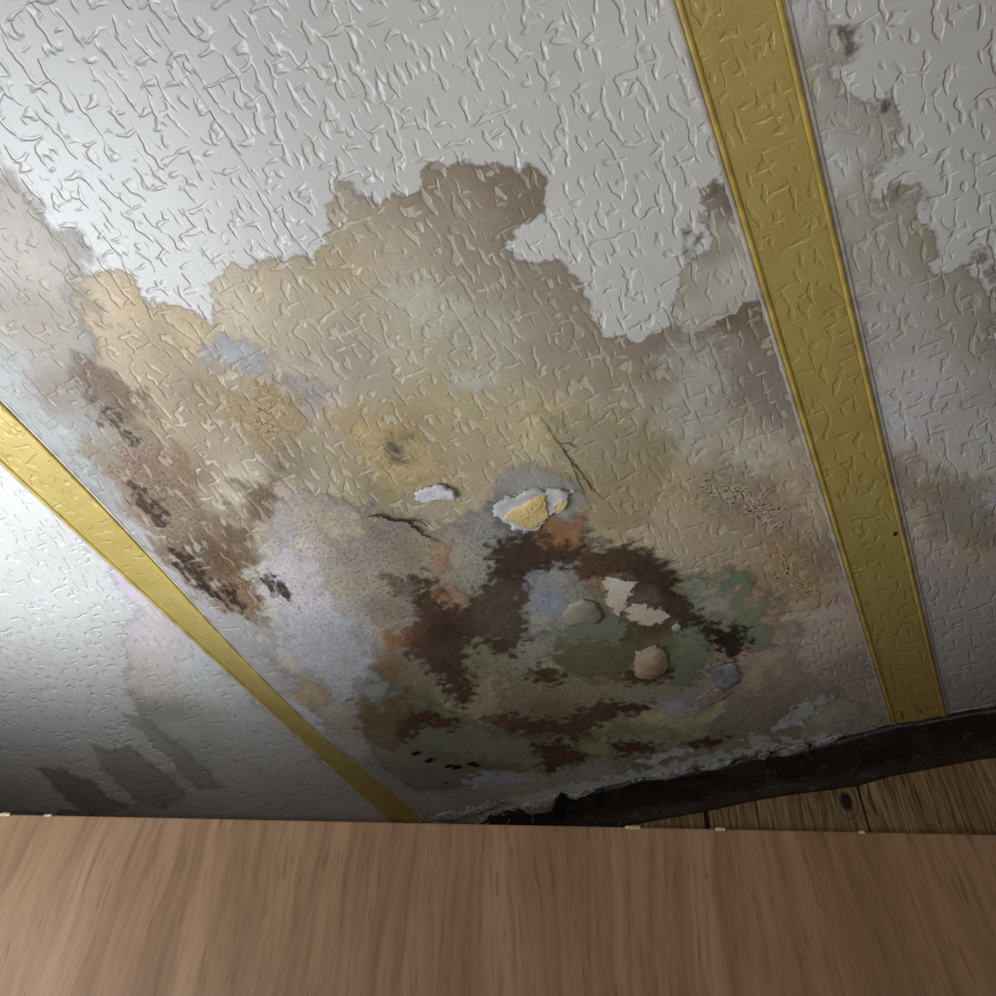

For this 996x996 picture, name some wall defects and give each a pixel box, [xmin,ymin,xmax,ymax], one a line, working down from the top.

water stain [28,559,389,822]
crack [368,514,438,542]
peeling [414,484,457,503]
water stain [0,161,889,767]
water stain [444,698,655,790]
flaking render [241,487,881,824]
water stain [783,0,996,710]